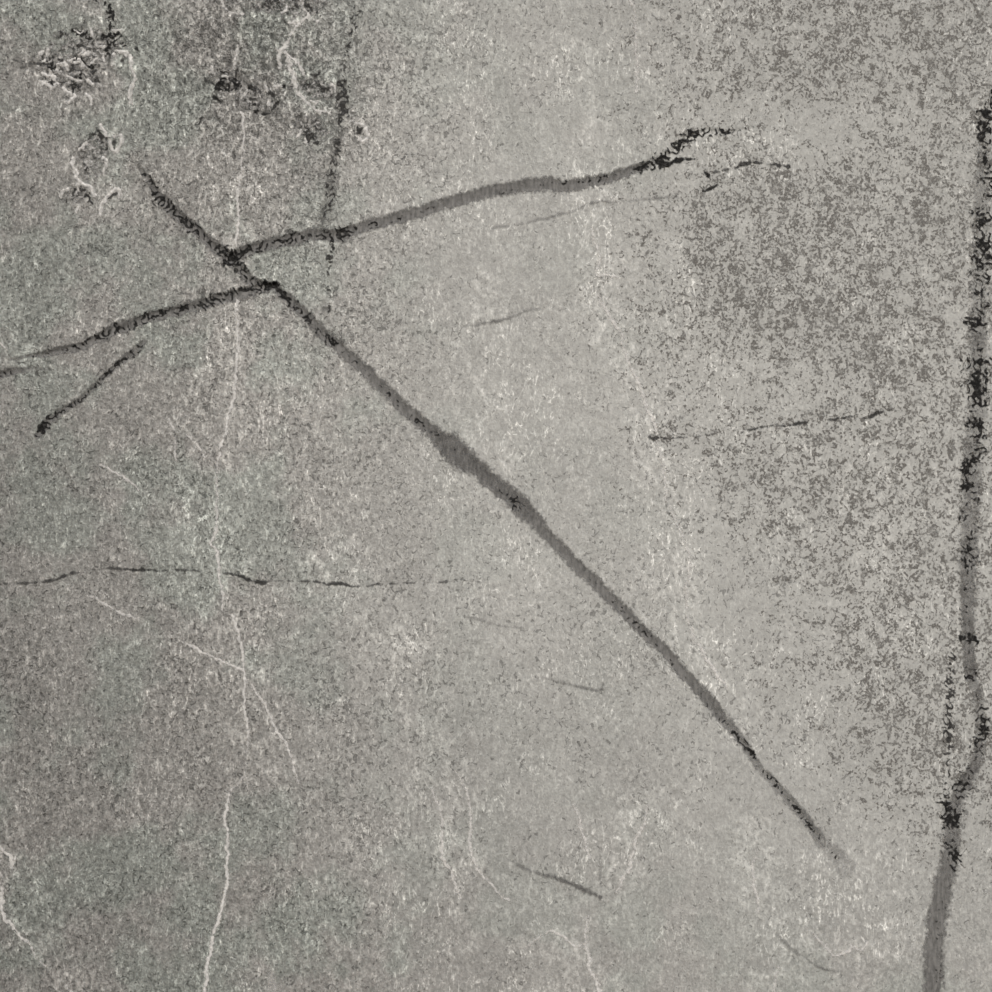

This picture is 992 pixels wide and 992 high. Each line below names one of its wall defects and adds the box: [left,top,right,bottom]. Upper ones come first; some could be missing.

crack [0,0,837,859]
crack [747,411,884,430]
crack [922,89,992,992]